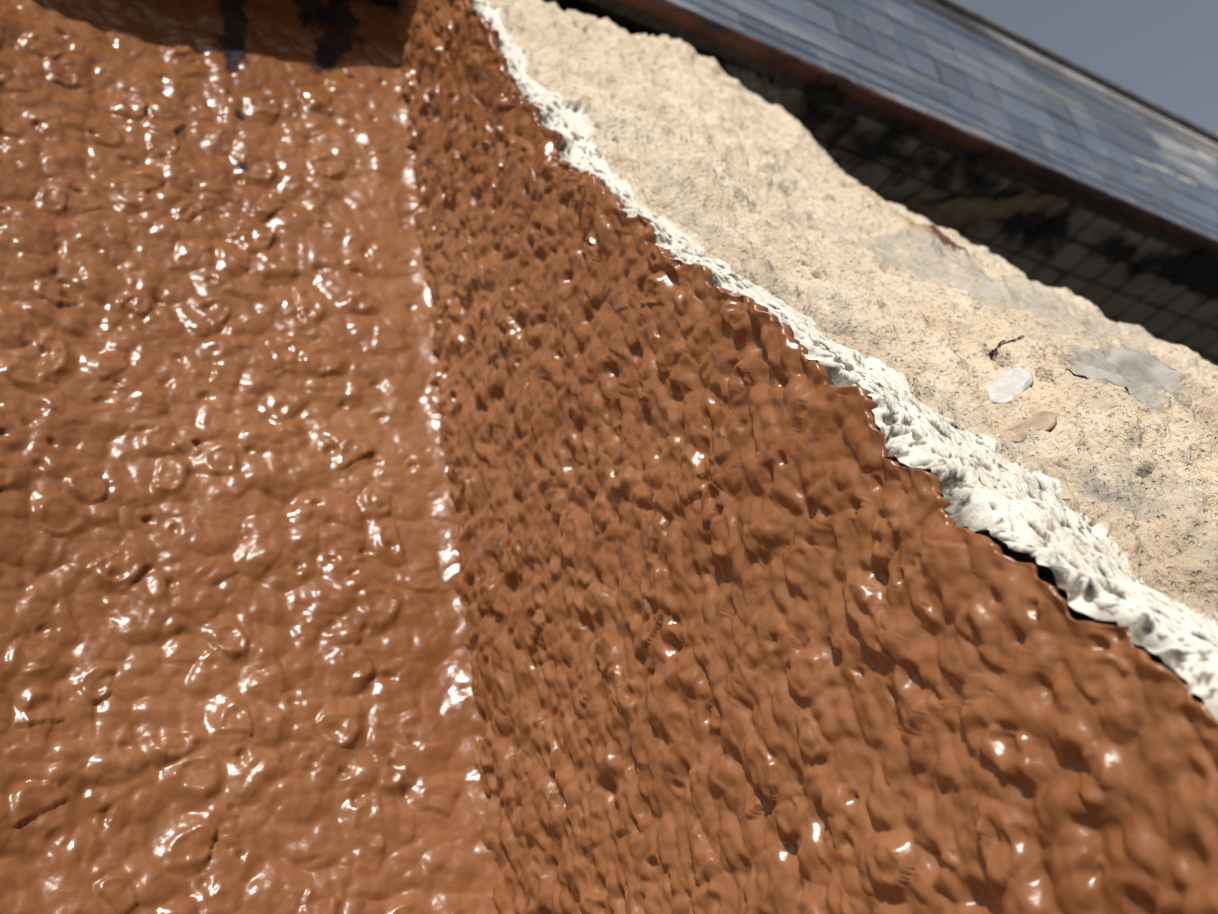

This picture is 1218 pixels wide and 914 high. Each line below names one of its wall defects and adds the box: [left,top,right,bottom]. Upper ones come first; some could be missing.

damp [217,0,248,71]
damp [292,0,399,72]
rust [896,211,968,255]
damp [1093,237,1218,306]
spalling [471,0,1218,720]